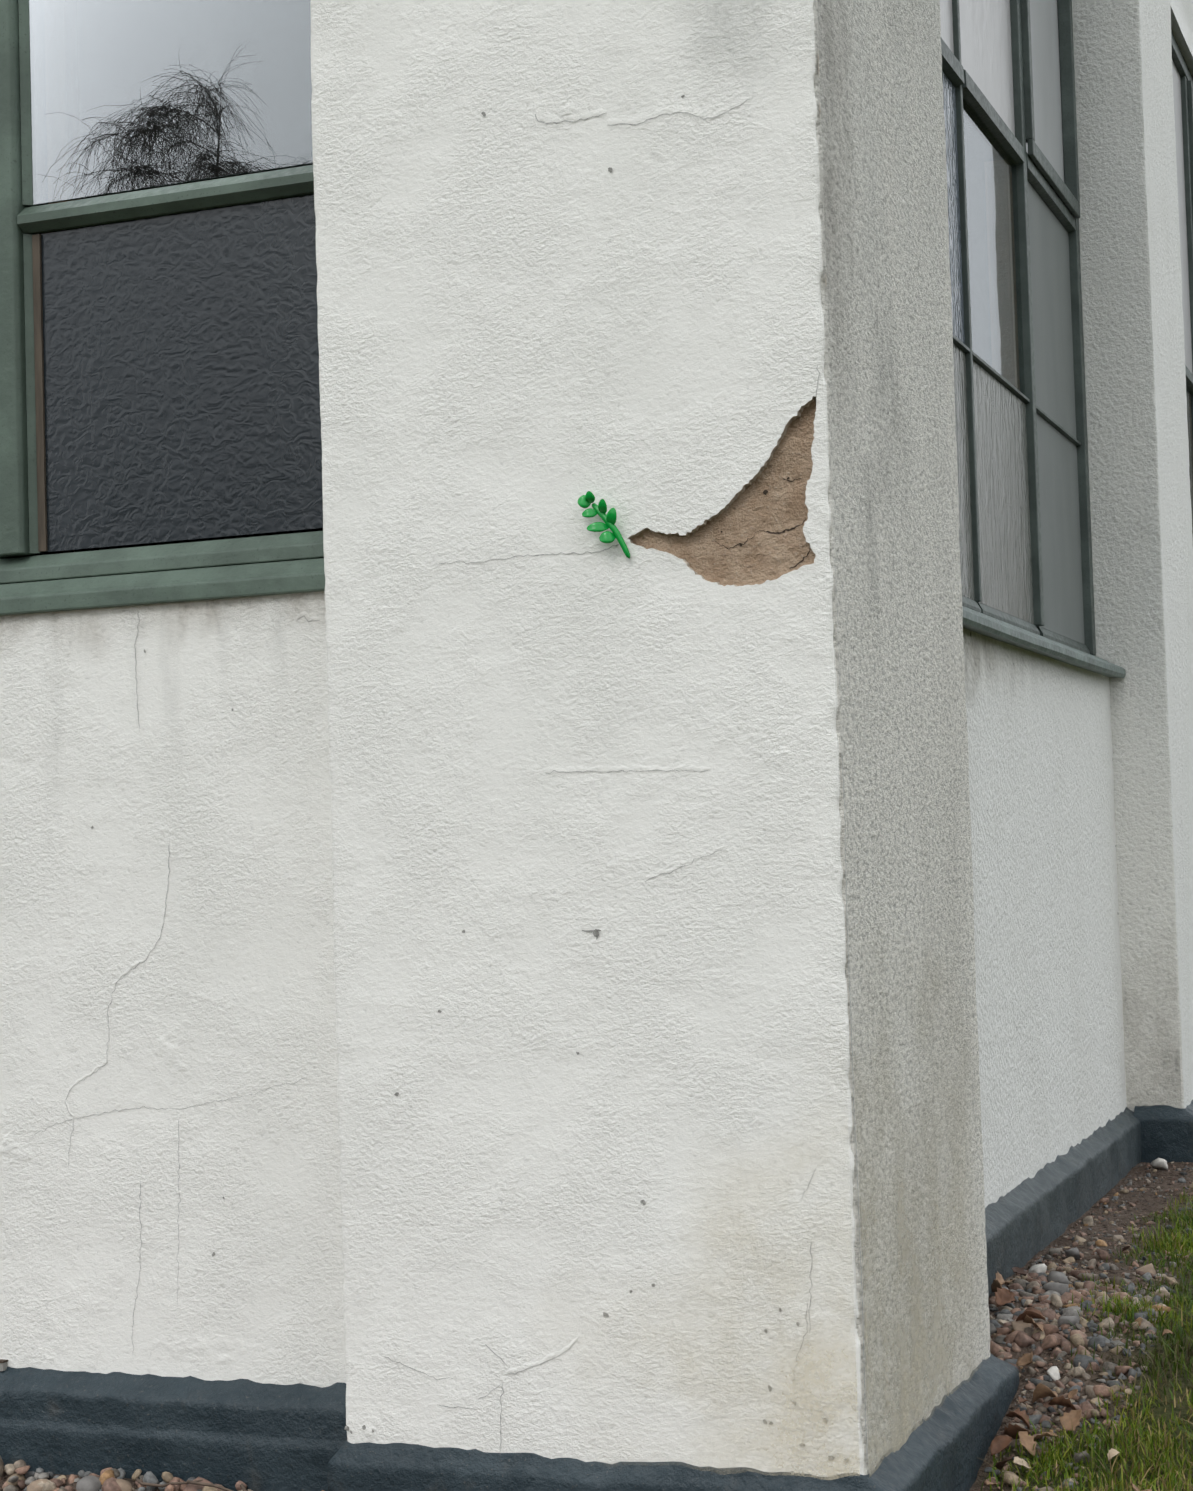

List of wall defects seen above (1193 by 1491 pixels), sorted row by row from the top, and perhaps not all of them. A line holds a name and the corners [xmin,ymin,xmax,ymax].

flaking render [627,396,816,587]
crack [32,840,303,1303]
crack [132,1183,142,1350]